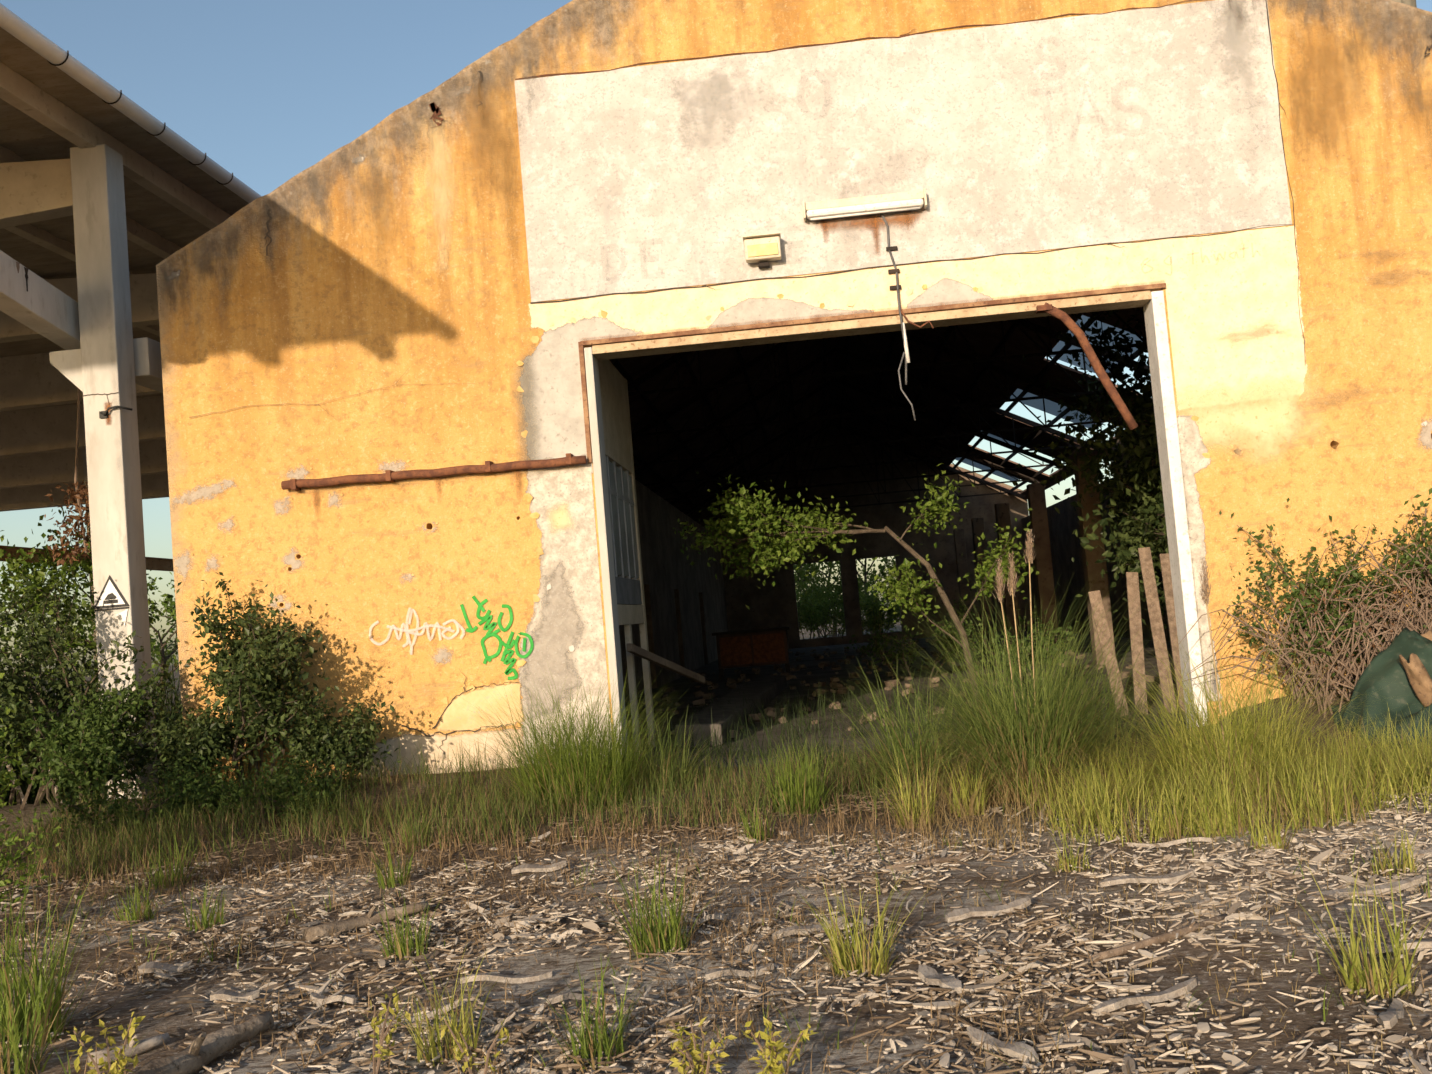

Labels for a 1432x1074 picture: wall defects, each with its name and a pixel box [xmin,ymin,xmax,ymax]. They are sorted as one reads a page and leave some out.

corrosion [821,213,917,251]
hole [1419,419,1432,449]
spalling [287,465,312,479]
spalling [172,479,233,505]
peeling [361,226,1308,779]
spalling [174,551,224,577]
spalling [284,548,307,570]